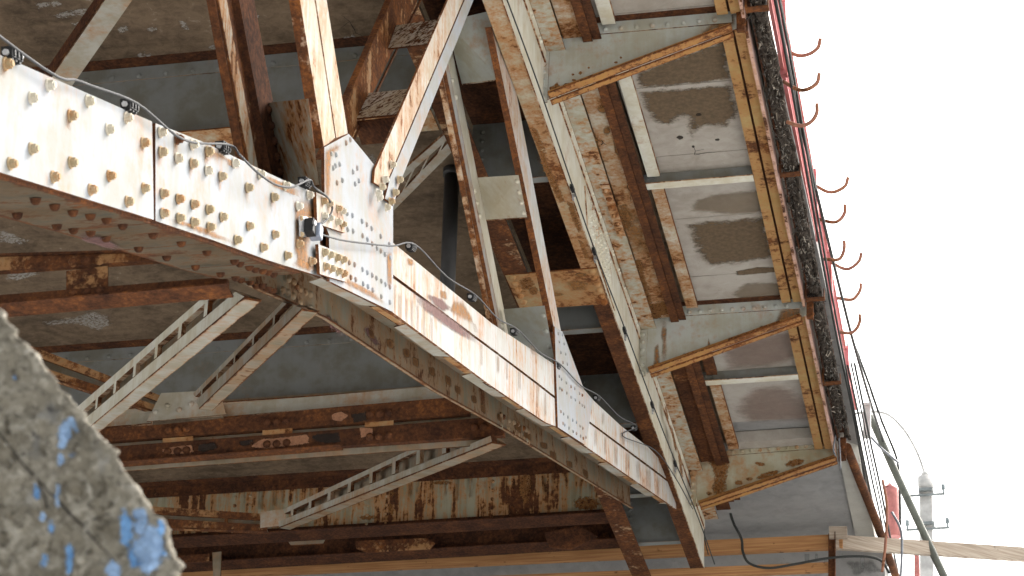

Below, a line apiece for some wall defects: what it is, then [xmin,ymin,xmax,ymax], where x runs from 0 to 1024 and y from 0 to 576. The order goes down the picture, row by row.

leakage [638,42,737,134]
corrosion [532,129,588,259]
corrosion [519,278,538,295]
leakage [689,192,780,298]
peeling [239,412,373,449]
corrosion [706,459,805,495]